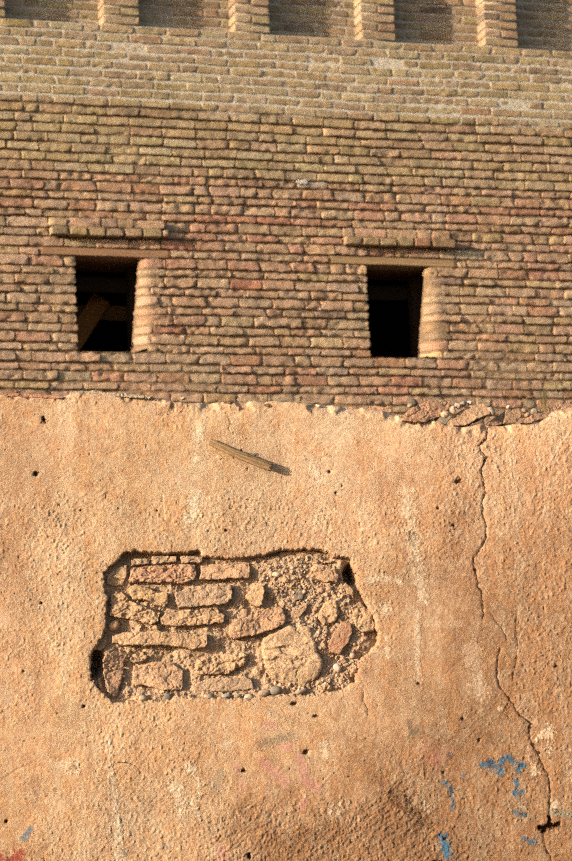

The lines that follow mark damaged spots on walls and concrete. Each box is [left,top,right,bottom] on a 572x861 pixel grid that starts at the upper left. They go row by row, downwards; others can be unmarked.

spalling [91,550,377,706]
crack [473,427,552,861]